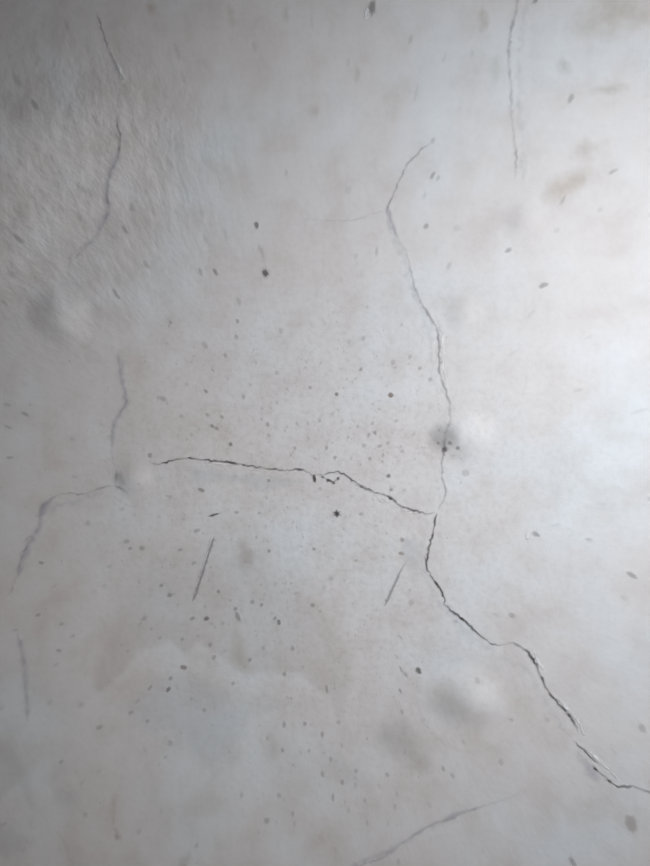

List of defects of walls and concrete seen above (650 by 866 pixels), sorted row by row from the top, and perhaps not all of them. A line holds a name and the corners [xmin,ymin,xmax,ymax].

crack [163,457,493,645]
crack [527,651,618,787]